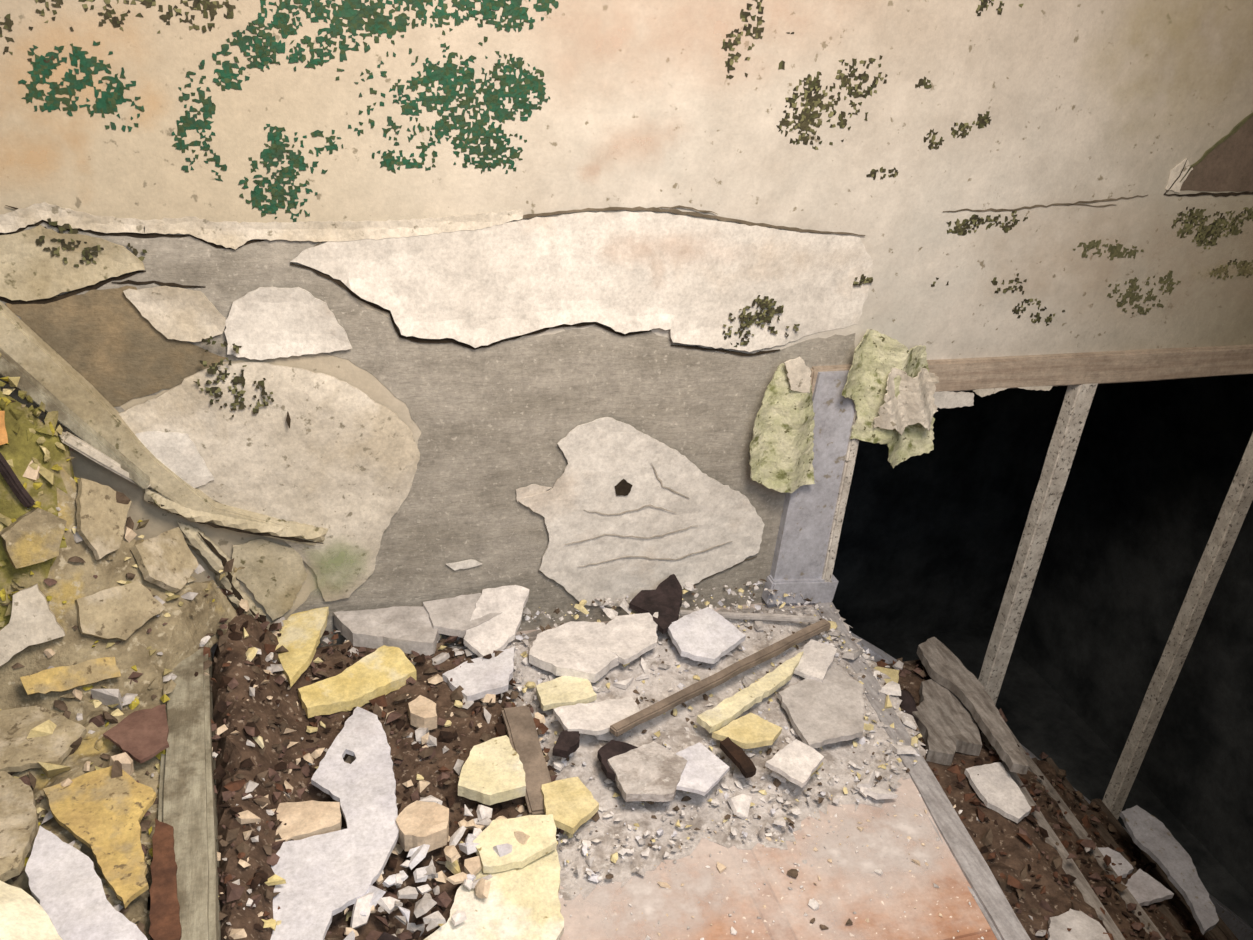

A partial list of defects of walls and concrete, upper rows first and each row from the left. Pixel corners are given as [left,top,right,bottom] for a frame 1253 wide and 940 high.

flaking render [1166,112,1253,193]
crack [943,160,1253,212]
peeling [1171,207,1253,250]
peeling [1209,259,1253,280]
peeling [0,0,1053,665]